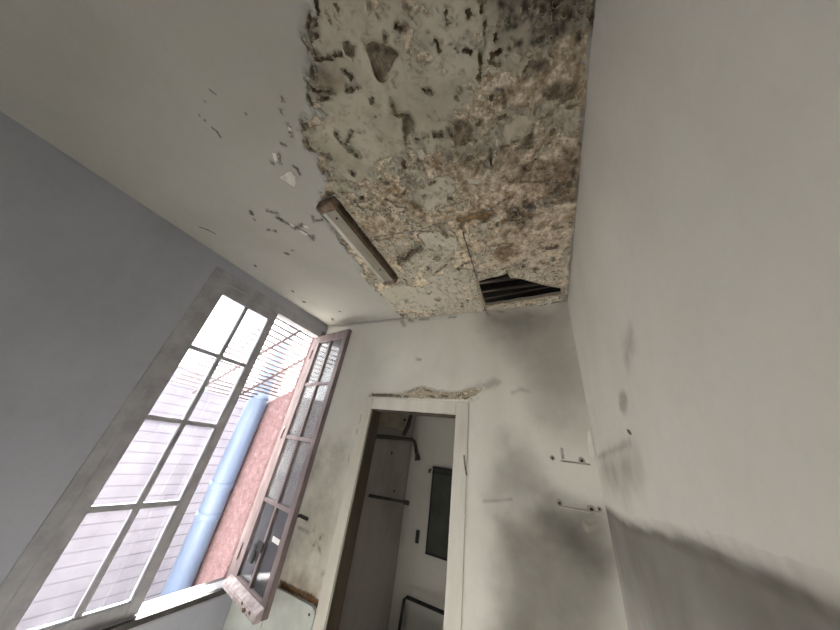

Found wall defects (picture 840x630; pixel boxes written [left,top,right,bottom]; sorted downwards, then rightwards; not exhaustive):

peeling [266,0,595,319]
spalling [367,384,485,402]